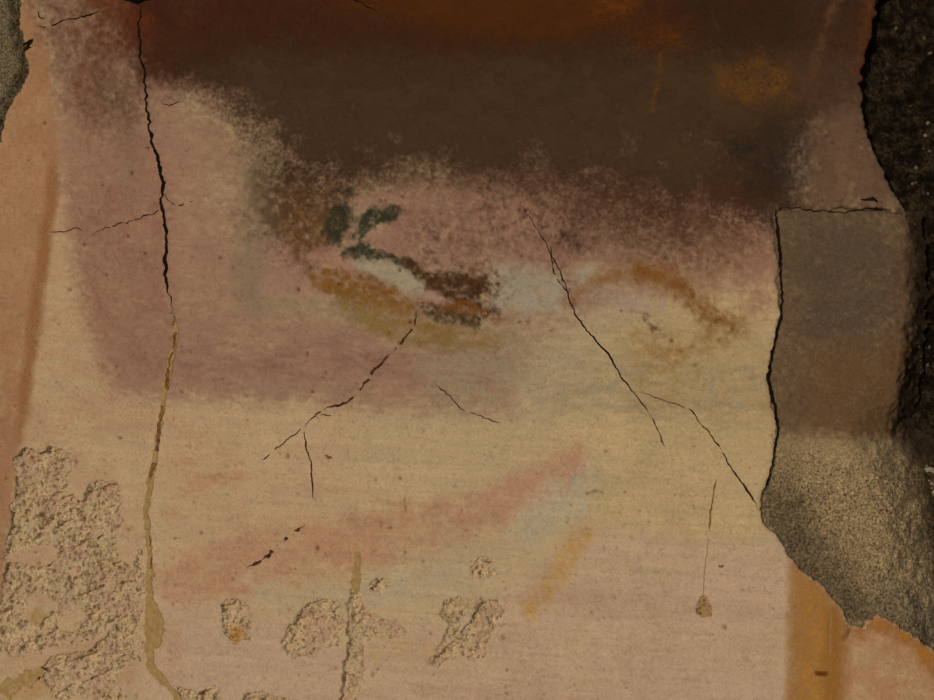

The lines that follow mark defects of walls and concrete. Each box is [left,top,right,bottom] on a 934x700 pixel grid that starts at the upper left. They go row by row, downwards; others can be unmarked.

crack [18,8,97,51]
crack [57,0,192,700]
crack [262,315,417,497]
crack [520,197,882,593]
flaking render [0,447,146,700]
crack [248,525,305,567]
flaking render [222,598,252,645]
flaking render [280,577,412,700]
flaking render [427,596,506,669]
flaking render [178,684,222,700]
flaking render [243,691,293,700]